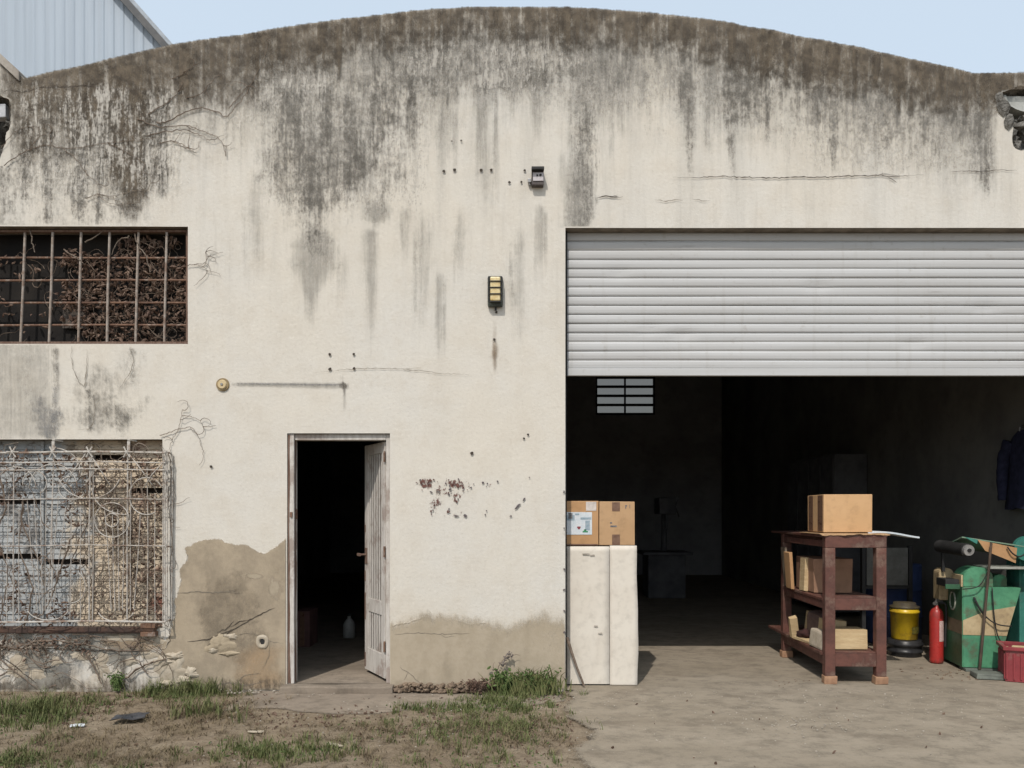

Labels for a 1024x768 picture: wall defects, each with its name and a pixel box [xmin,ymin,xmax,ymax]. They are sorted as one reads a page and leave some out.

leakage [0,6,1024,226]
crack [661,174,914,202]
crack [1,648,115,683]
flaking render [0,538,286,690]
crack [136,609,279,686]
flaking render [390,610,565,688]